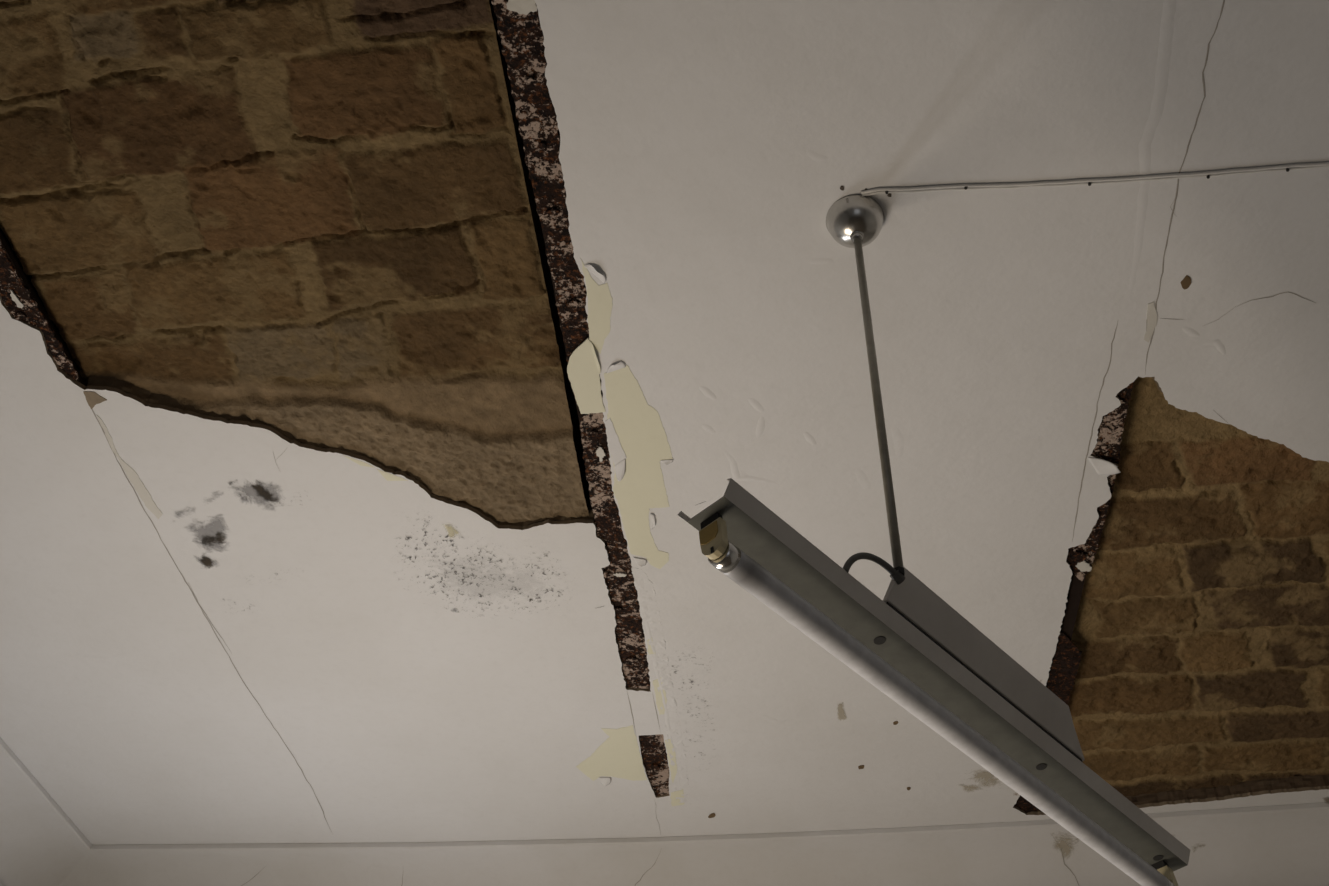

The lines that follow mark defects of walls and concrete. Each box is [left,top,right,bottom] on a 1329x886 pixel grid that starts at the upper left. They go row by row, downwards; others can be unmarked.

mould [190,520,226,567]
crack [92,409,331,830]
mould [229,482,278,505]
spalling [0,0,673,569]
peeling [576,725,647,786]
peeling [665,739,684,807]
crack [1072,0,1313,541]
spalling [1067,376,1329,805]